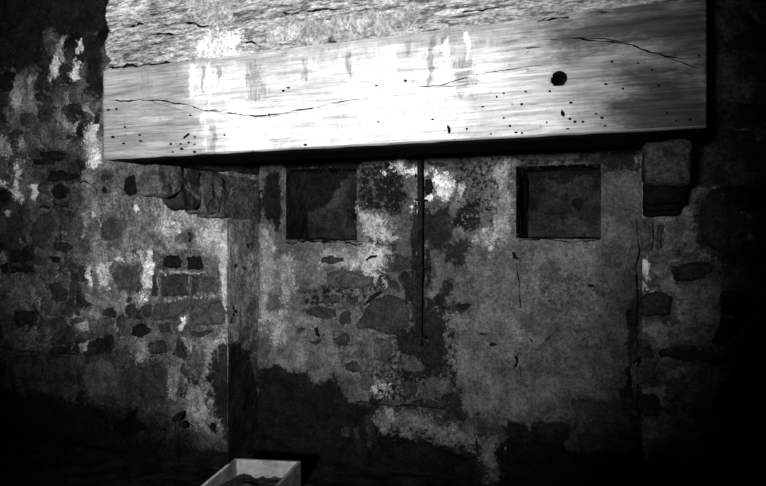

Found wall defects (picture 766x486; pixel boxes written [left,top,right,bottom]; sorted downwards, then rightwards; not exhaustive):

peeling [52,92,95,136]
spalling [0,143,82,308]
spalling [95,211,127,246]
spalling [97,169,142,200]
damp [357,153,517,269]
spalling [74,228,234,434]
spalling [258,201,501,484]
damp [368,277,471,411]
crack [635,216,654,438]